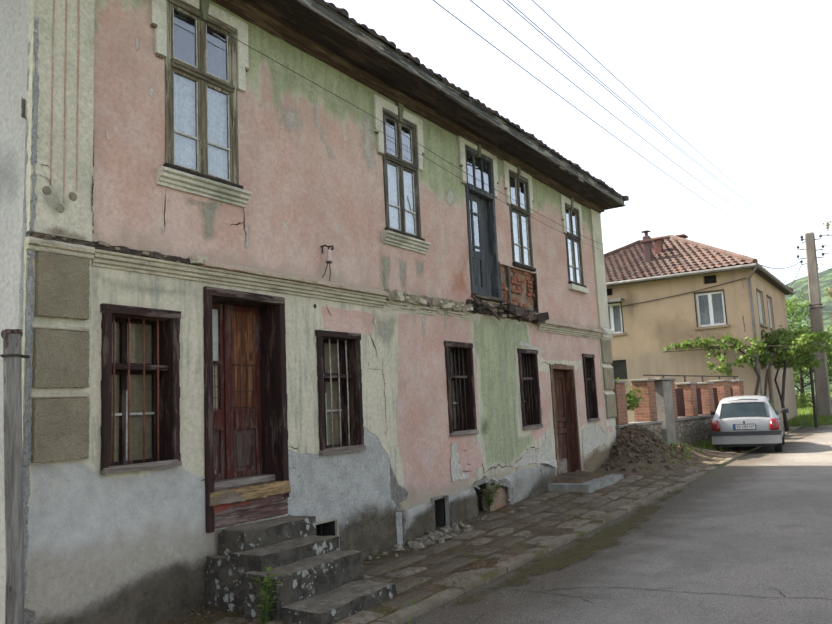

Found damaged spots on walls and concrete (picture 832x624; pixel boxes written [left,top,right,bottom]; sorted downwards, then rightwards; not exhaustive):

flaking render [498,261,539,313]
crack [368,318,387,432]
peeling [288,426,408,546]
crack [463,446,542,482]
water stain [48,564,207,624]